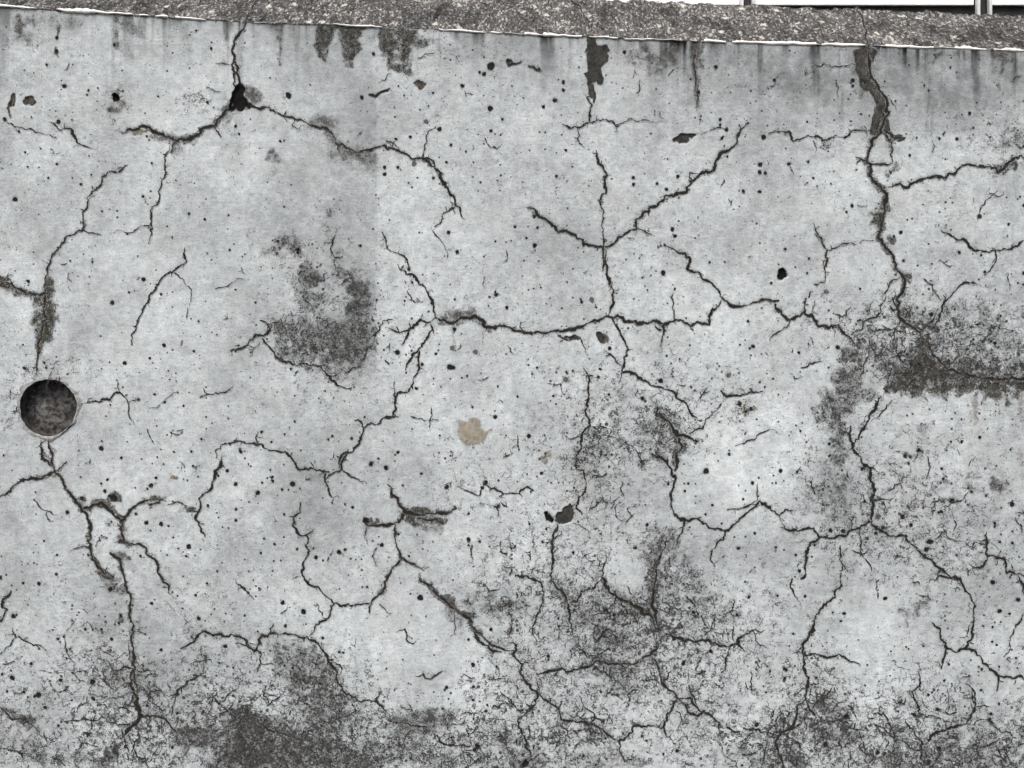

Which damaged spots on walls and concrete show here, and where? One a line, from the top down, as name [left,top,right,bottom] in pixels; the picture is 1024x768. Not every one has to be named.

leakage [314,26,438,77]
leakage [584,38,705,109]
leakage [847,47,906,143]
crack [0,439,175,598]
crack [49,552,212,768]
crack [0,0,464,414]
leakage [170,635,461,768]
mould [262,235,376,381]
crack [180,483,504,768]
crack [168,6,1024,536]
crack [416,396,1024,768]
leakage [805,299,1024,527]